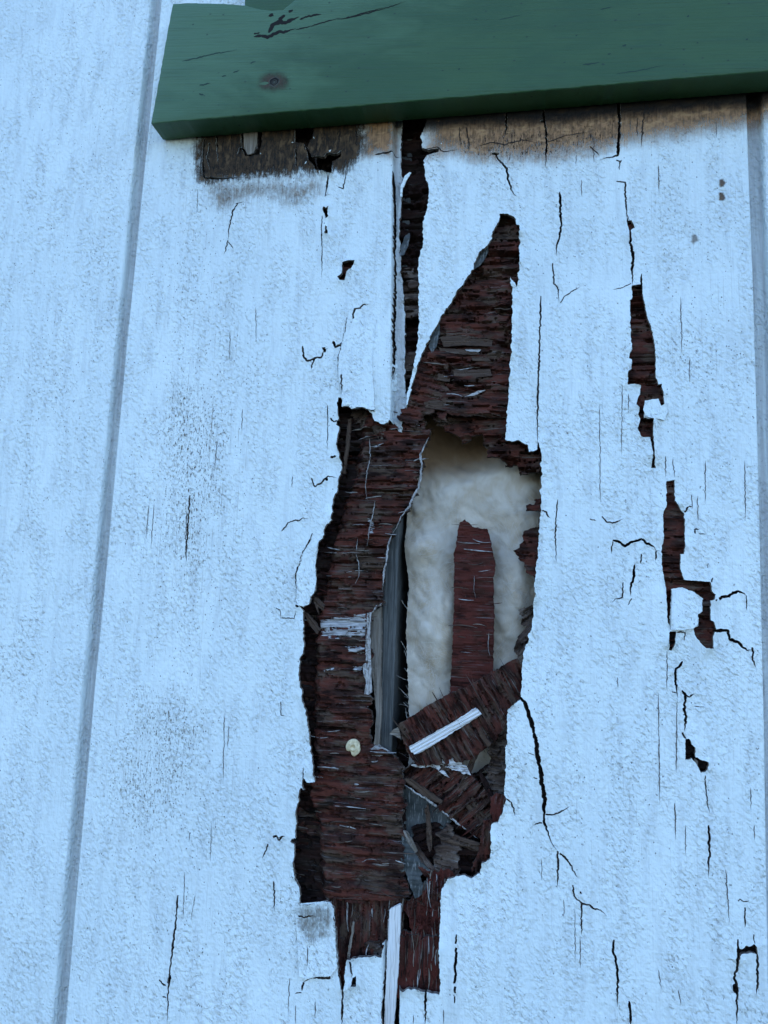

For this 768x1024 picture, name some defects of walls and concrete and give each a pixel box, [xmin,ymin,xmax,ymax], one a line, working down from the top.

leakage [193,122,395,204]
peeling [339,262,354,280]
crack [427,101,650,447]
peeling [338,318,376,410]
peeling [397,350,450,428]
peeling [643,399,669,420]
peeling [296,534,319,607]
peeling [669,588,702,648]
crack [711,578,747,610]
crack [505,696,605,966]
crack [658,629,758,1011]
peeling [294,901,337,979]